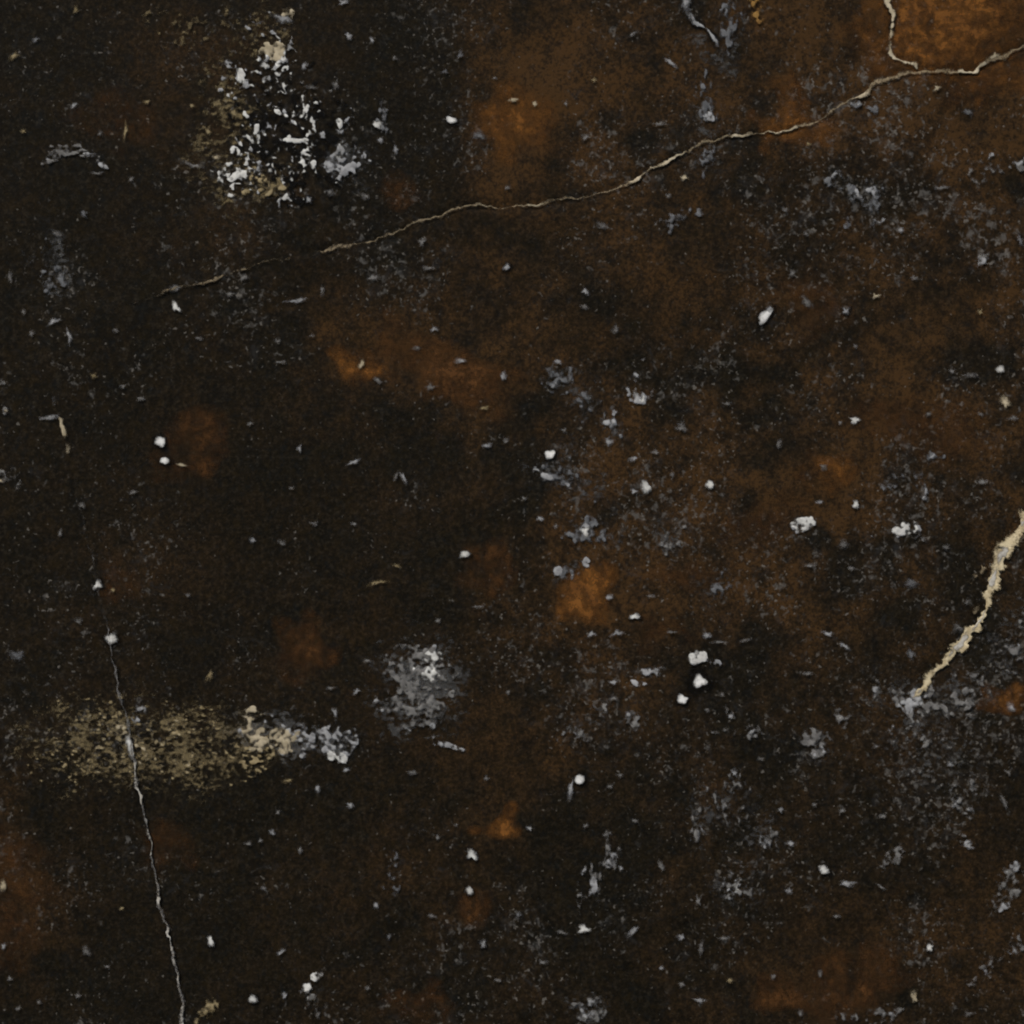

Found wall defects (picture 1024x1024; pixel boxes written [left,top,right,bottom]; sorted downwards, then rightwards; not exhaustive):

spalling [182,9,371,215]
crack [320,0,1024,252]
corrosion [882,0,1004,77]
crack [161,263,259,294]
corrosion [558,564,611,620]
crack [913,511,1024,698]
crack [107,627,184,1024]